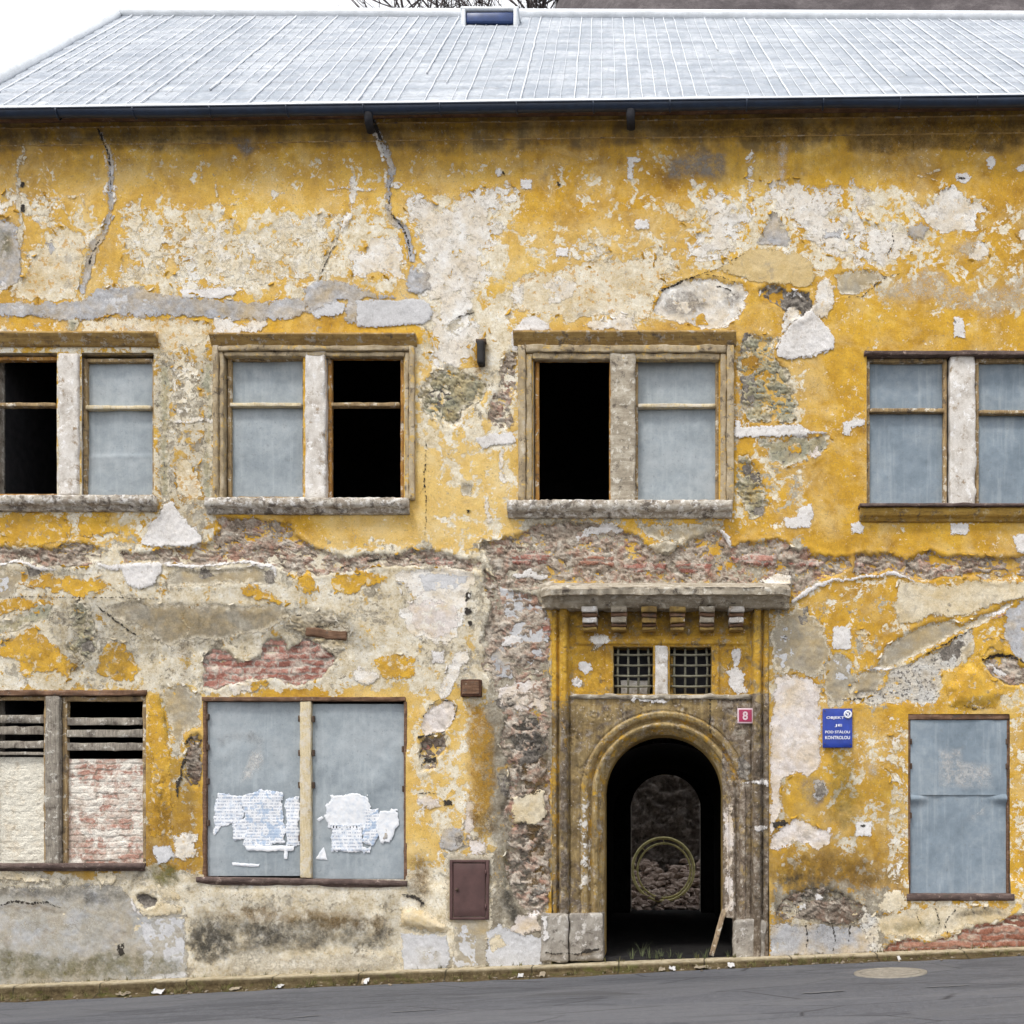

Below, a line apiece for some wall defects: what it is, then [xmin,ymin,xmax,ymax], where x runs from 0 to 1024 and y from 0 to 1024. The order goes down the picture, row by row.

crack [15,128,118,294]
crack [372,119,416,274]
peeling [106,150,1022,468]
flaking render [0,512,1024,966]
water stain [196,929,230,953]